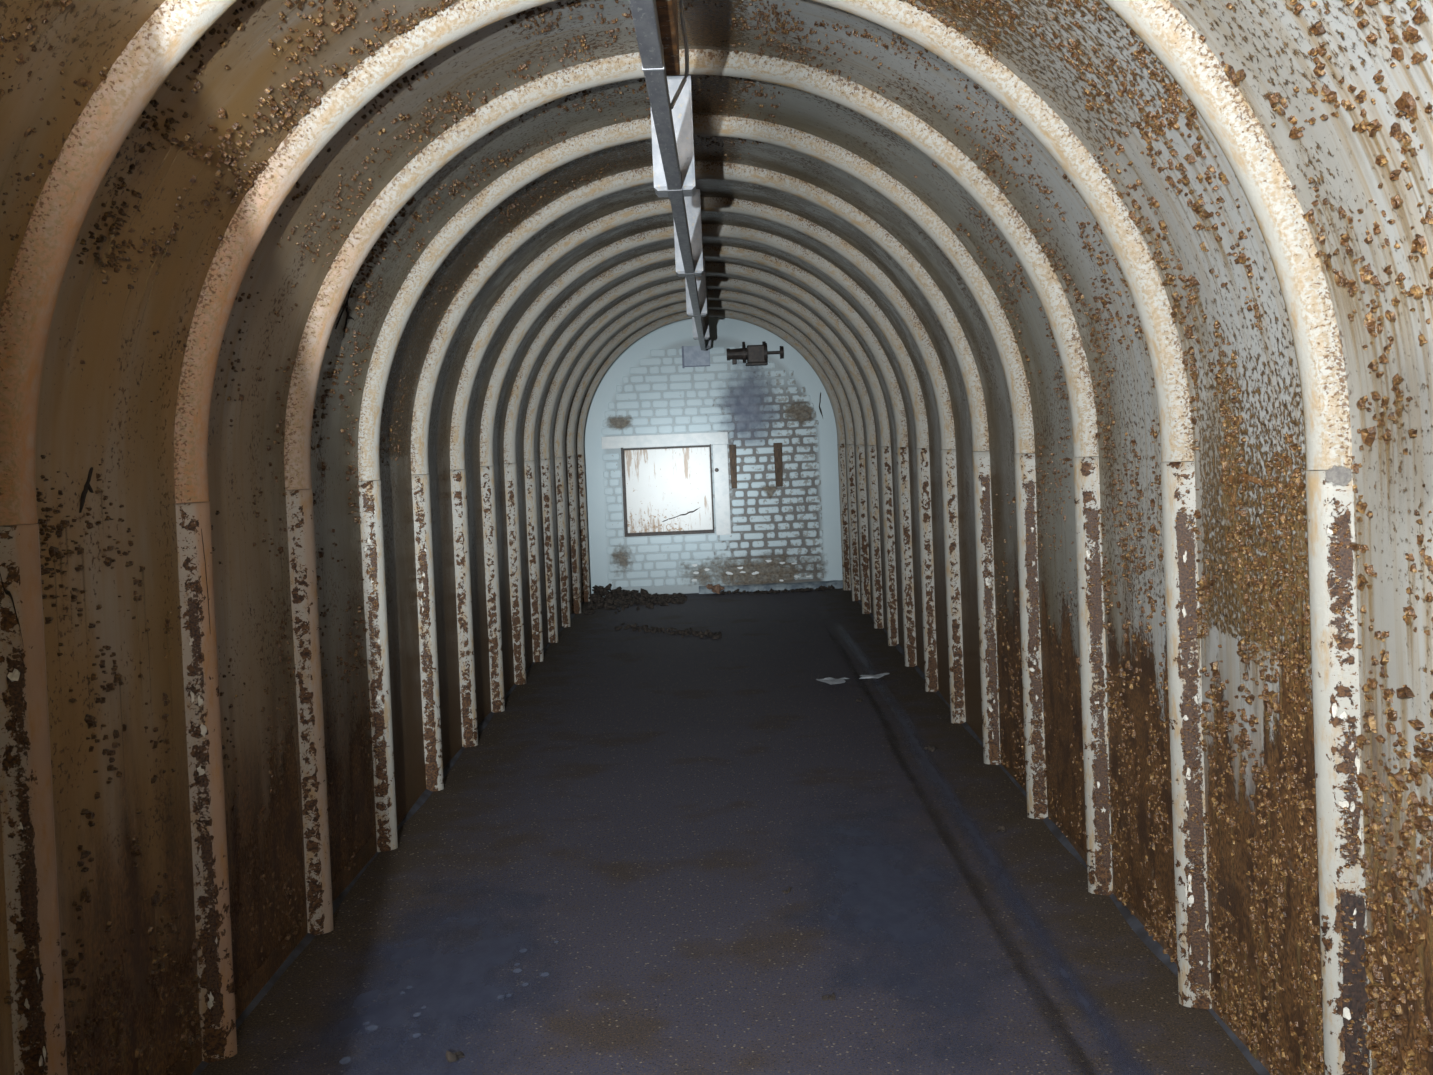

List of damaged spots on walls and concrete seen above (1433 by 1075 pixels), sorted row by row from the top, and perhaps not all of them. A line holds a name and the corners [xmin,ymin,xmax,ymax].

corrosion [0,0,148,106]
peeling [6,646,46,1075]
peeling [187,591,221,1027]
peeling [364,538,386,773]
peeling [980,472,1000,748]
peeling [1023,477,1045,800]
peeling [1084,505,1112,869]
peeling [1174,507,1210,994]
corrosion [1186,0,1433,1075]
peeling [1327,508,1355,671]
peeling [1332,700,1362,870]
peeling [1340,888,1373,1075]